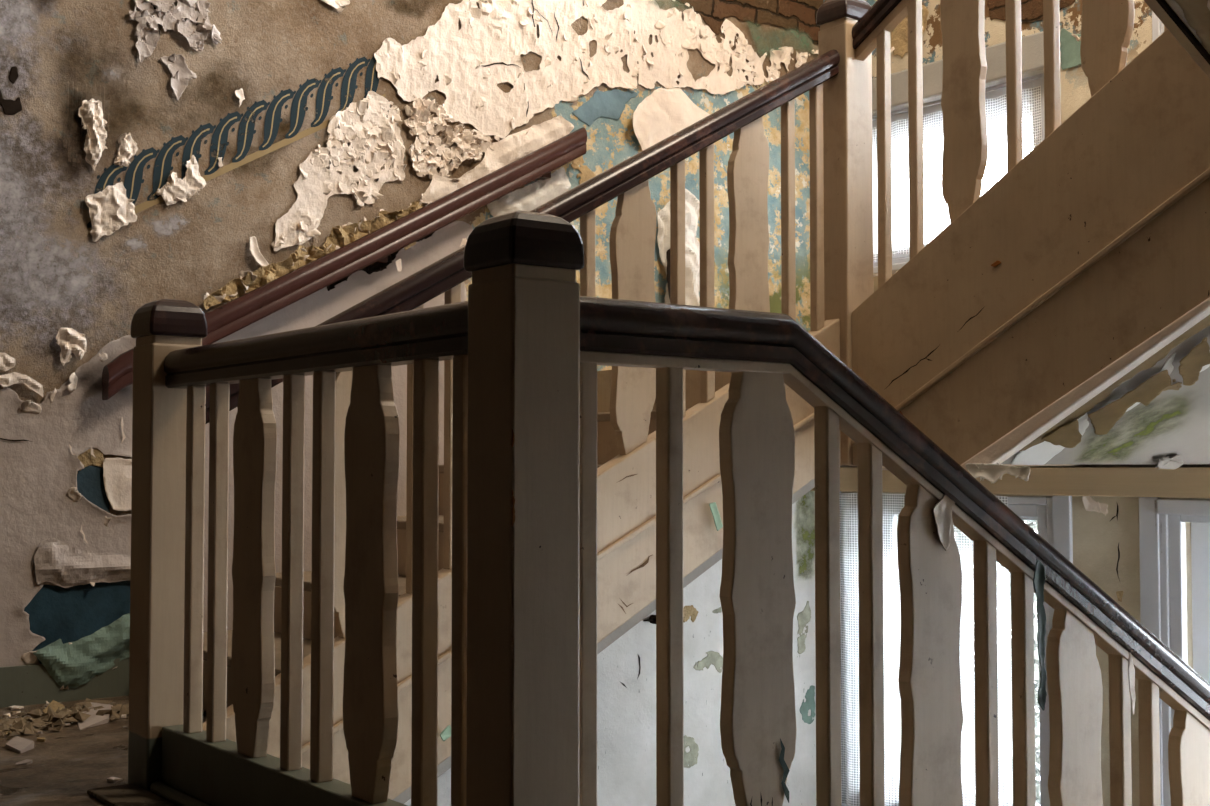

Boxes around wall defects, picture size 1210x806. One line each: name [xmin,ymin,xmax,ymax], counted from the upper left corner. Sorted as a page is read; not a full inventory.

peeling [129,0,222,101]
peeling [198,0,823,313]
peeling [213,221,473,344]
peeling [0,327,136,667]
peeling [227,407,238,630]
peeling [271,382,283,573]
peeling [304,375,313,571]
peeling [392,365,407,516]
peeling [965,315,1210,483]
mould [1080,400,1187,460]